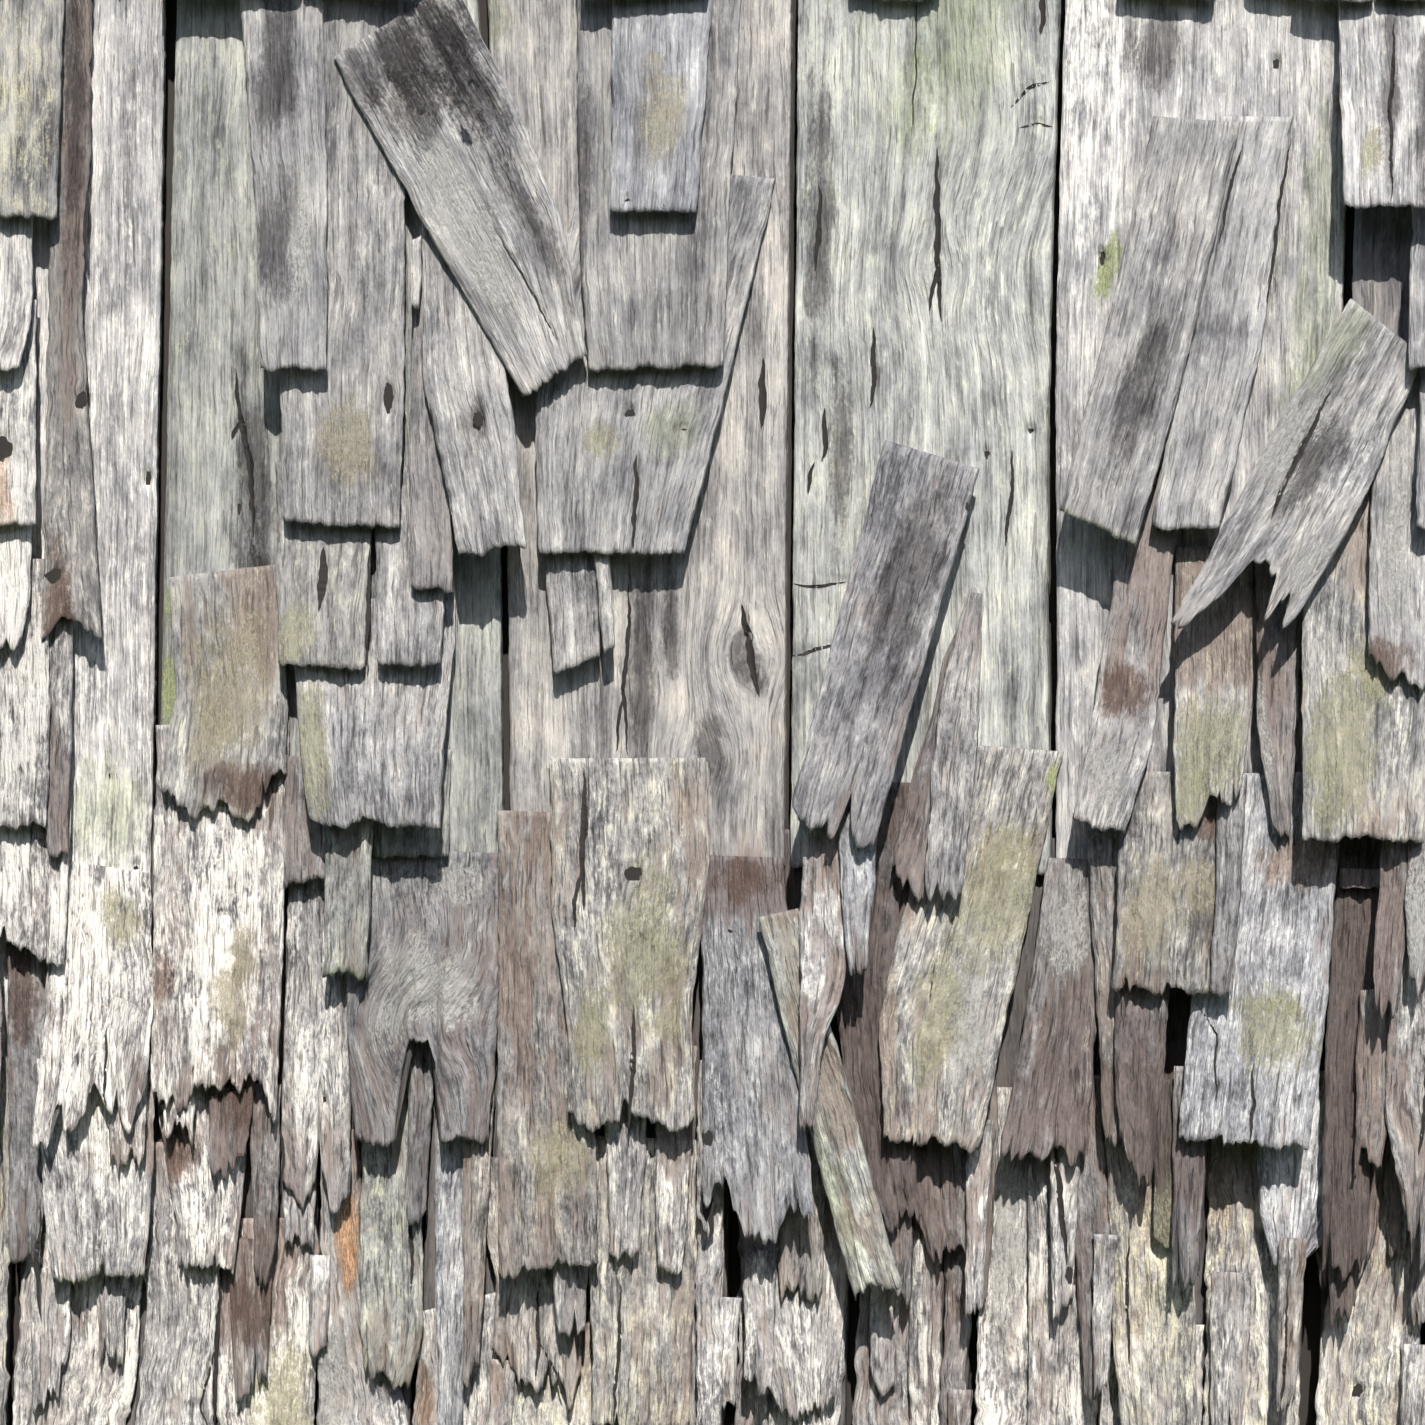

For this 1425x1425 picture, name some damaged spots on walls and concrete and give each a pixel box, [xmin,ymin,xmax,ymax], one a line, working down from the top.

crack [911,2,942,322]
crack [631,455,639,548]
crack [741,604,760,697]
crack [793,644,831,656]
damp [941,952,990,1089]